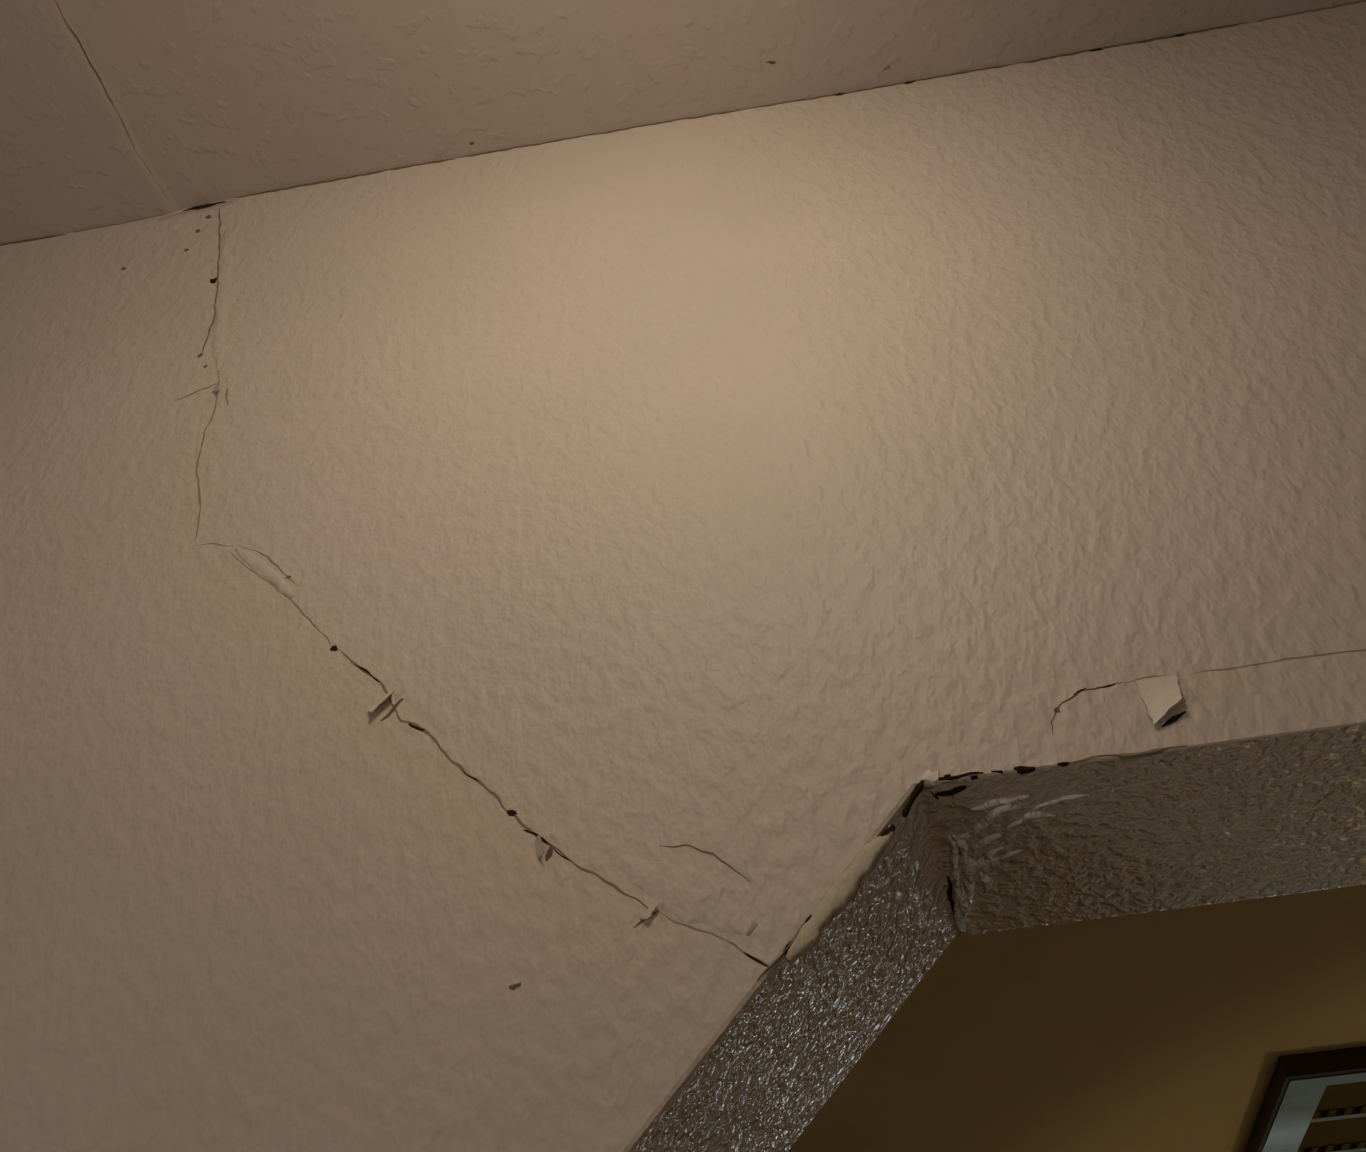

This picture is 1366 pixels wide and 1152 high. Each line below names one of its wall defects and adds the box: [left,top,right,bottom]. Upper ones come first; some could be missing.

crack [0,0,1366,586]
crack [269,582,769,967]